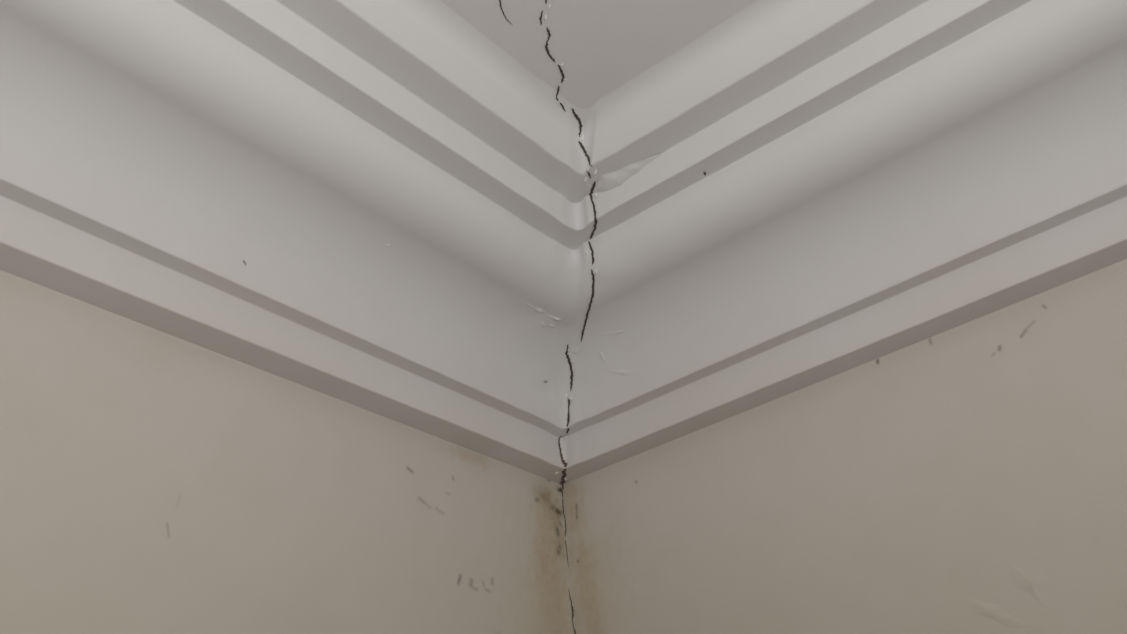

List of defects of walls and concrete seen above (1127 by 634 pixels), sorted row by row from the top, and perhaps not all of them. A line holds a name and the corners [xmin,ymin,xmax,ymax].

leakage [442,441,666,634]
crack [539,0,598,634]